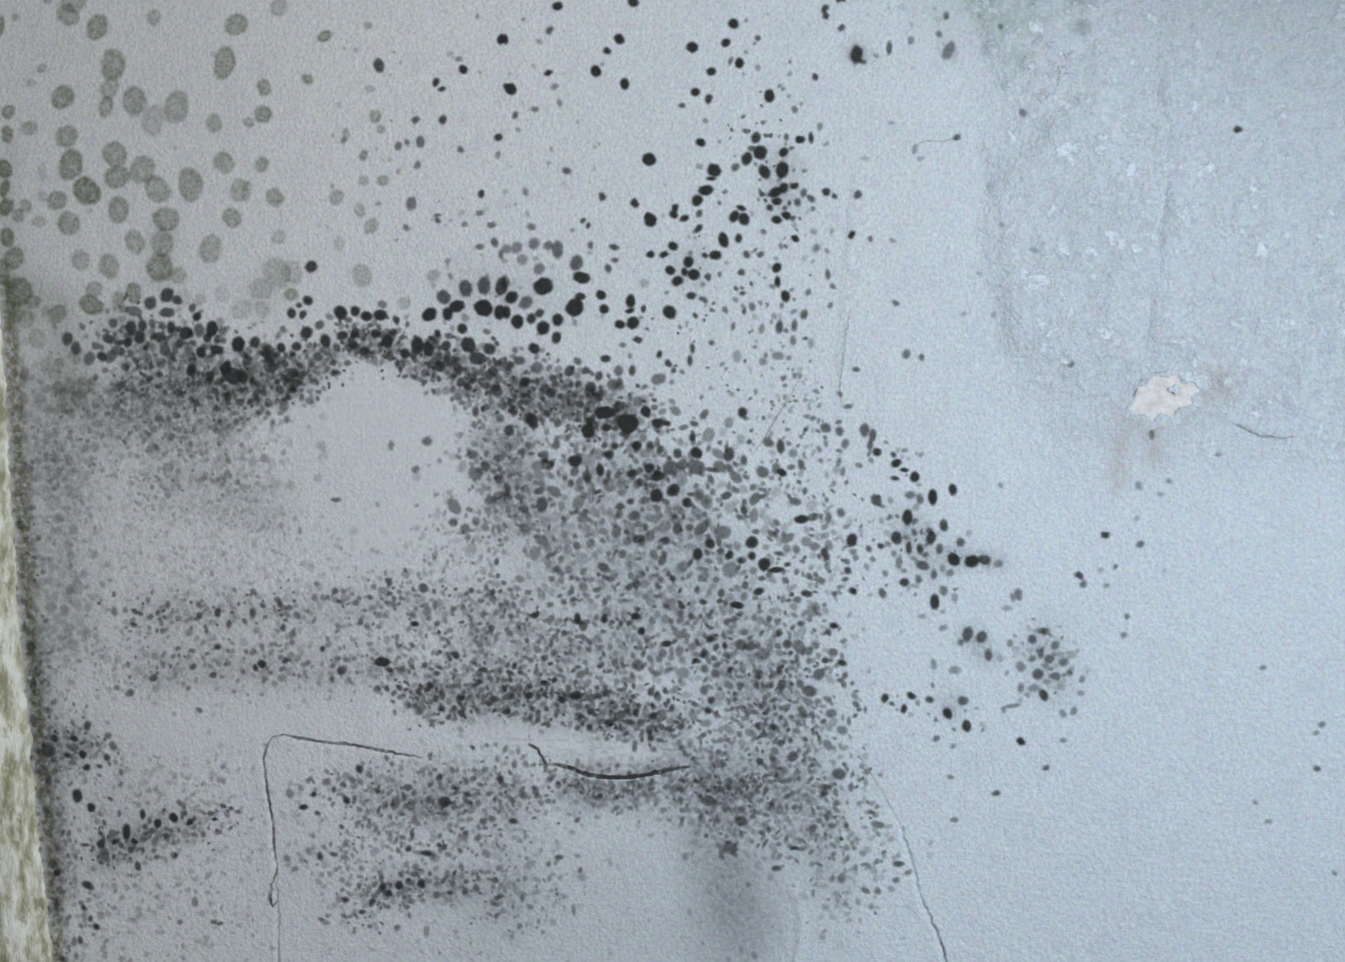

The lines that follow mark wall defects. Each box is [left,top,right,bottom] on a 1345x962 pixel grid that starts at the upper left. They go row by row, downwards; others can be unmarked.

damp [504,84,516,95]
damp [591,34,624,76]
damp [722,19,744,68]
damp [851,46,865,63]
damp [58,136,127,231]
damp [631,88,837,321]
damp [63,218,991,814]
damp [0,160,115,961]
damp [1029,628,1066,700]
damp [73,789,240,870]
damp [343,830,461,933]